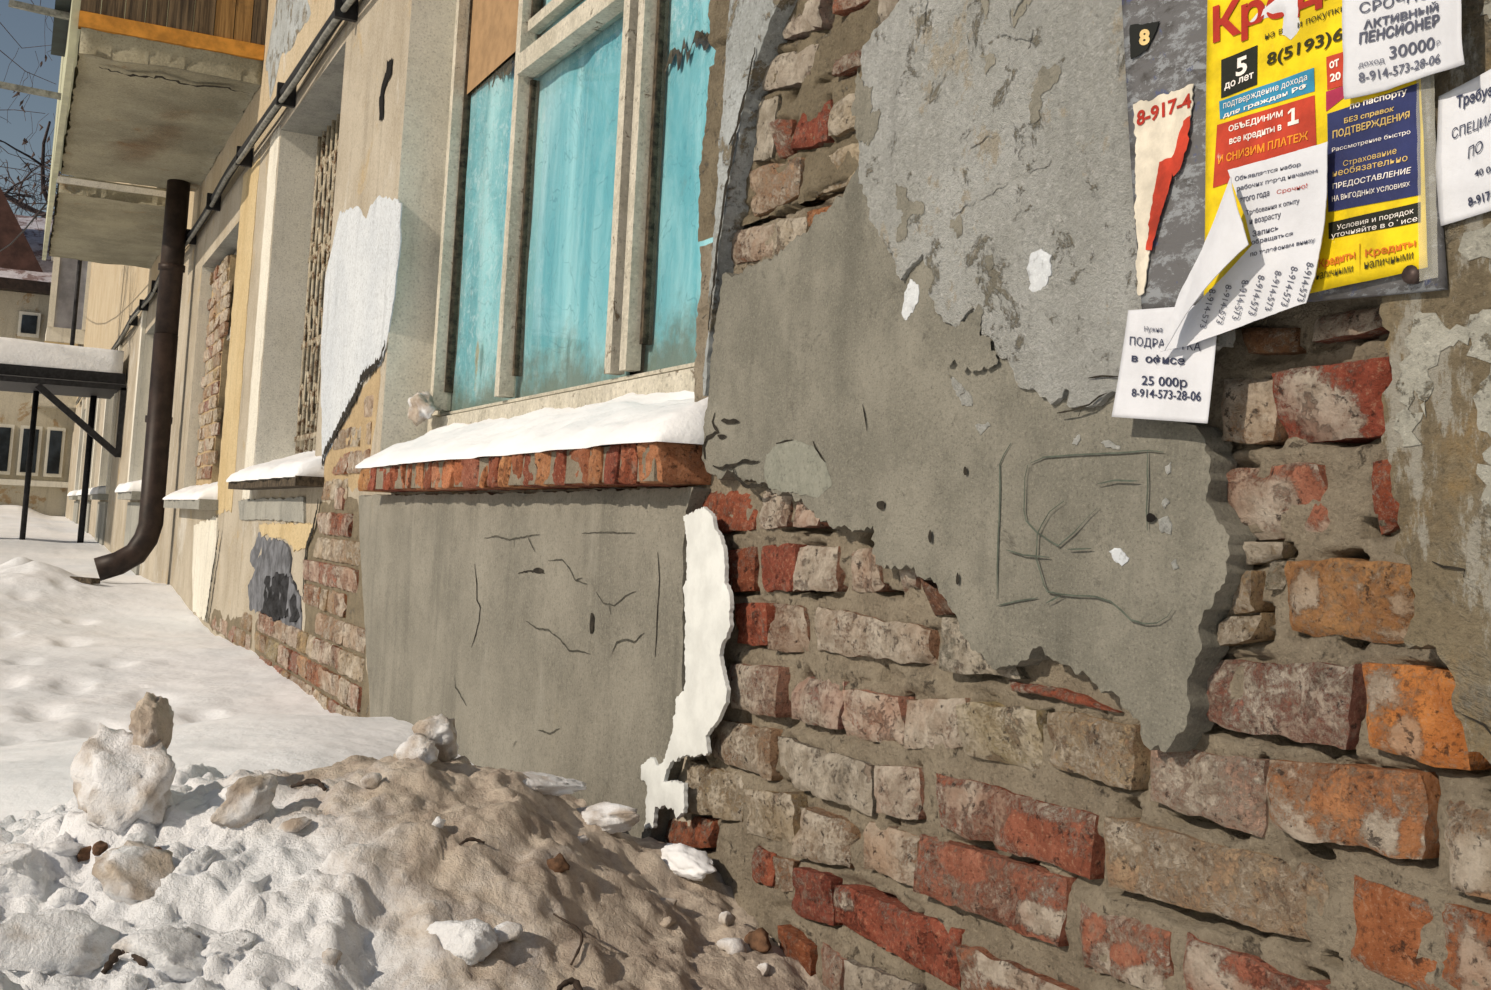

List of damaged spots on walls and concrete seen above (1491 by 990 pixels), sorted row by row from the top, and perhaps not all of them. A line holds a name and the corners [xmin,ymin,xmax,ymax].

spalling [694,0,730,402]
peeling [731,0,1142,408]
peeling [1458,222,1491,273]
peeling [1480,0,1491,19]
spalling [192,195,402,717]
crack [471,531,660,654]
crack [702,413,825,489]
spalling [641,296,1491,990]